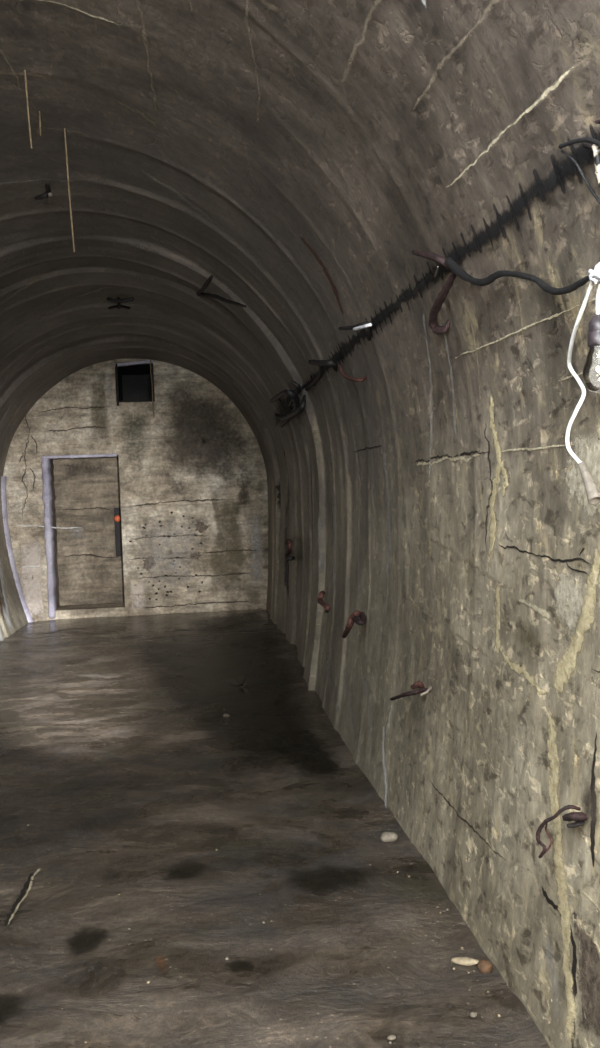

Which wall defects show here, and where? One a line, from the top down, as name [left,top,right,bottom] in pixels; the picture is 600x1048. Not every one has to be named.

damp [165,395,244,478]
damp [212,484,261,586]
crack [416,426,588,574]
crack [589,732,597,867]